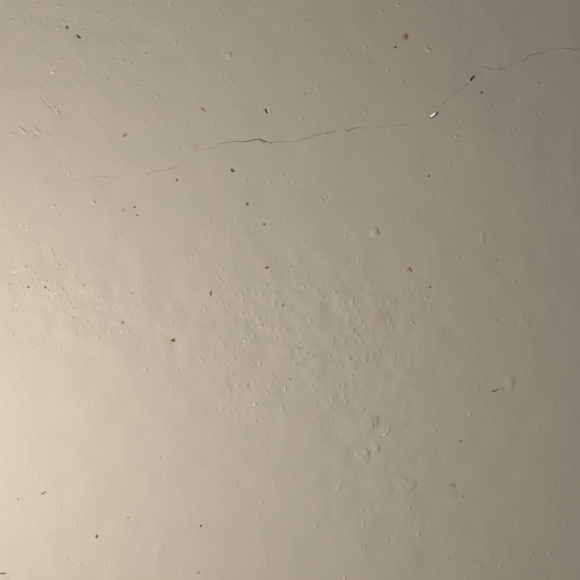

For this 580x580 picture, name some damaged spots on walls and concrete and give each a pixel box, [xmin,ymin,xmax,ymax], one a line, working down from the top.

crack [145,46,580,176]